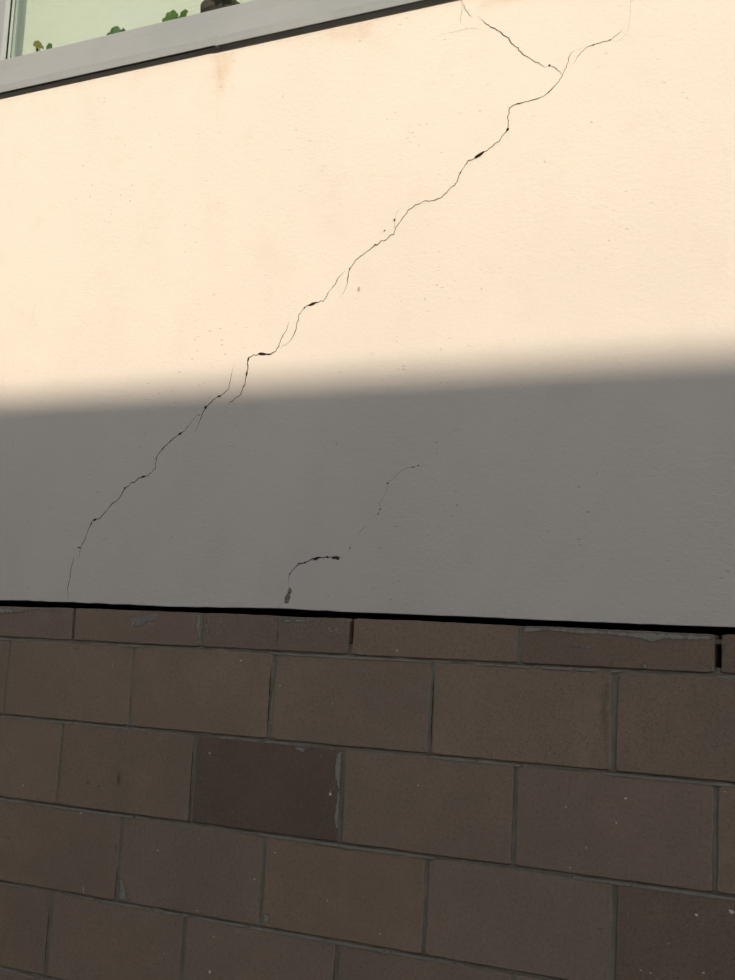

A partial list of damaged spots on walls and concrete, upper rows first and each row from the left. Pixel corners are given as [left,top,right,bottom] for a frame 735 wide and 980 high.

crack [67,0,633,593]